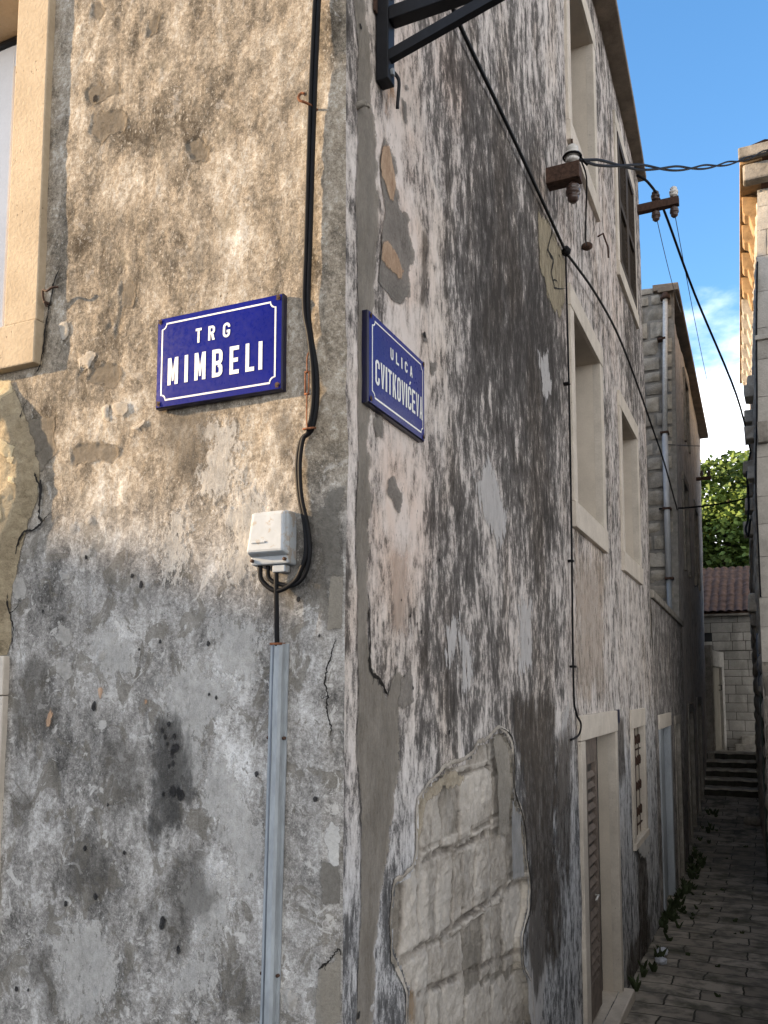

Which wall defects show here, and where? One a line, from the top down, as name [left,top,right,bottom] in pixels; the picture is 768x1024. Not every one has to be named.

water stain [537,349,552,401]
crack [15,472,52,554]
spalling [354,0,536,1024]
water stain [472,452,508,550]
crack [6,593,20,655]
water stain [91,407,273,1024]
crack [319,640,336,740]
crack [368,593,391,697]
water stain [444,611,476,702]
water stain [518,596,533,677]